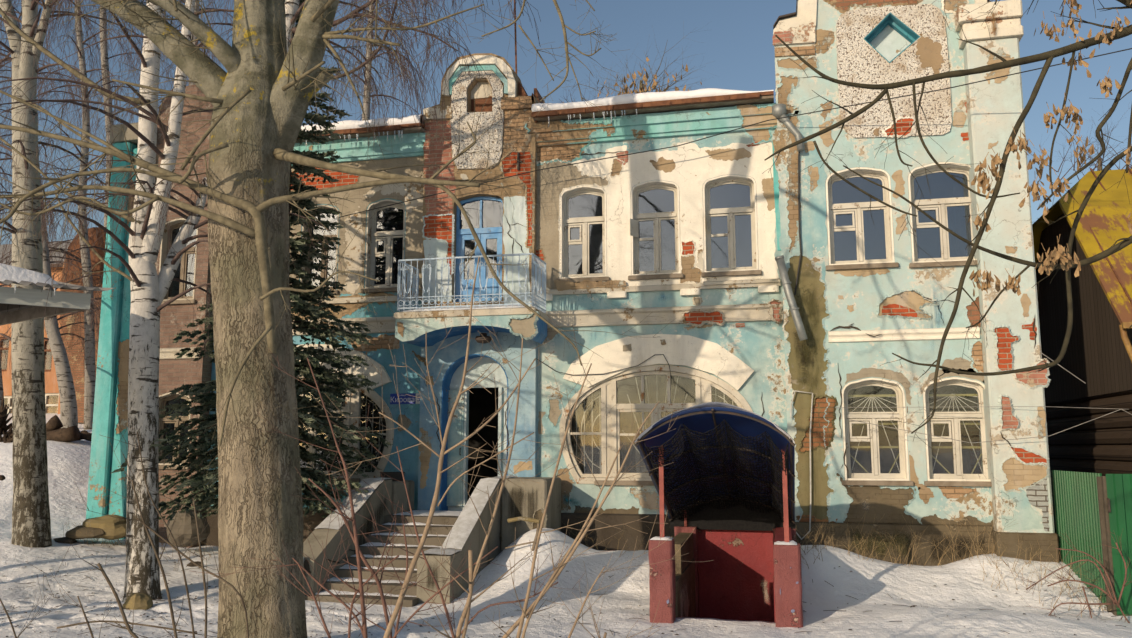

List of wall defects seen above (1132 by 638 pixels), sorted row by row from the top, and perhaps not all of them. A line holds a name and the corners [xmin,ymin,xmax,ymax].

flaking render [823,0,923,13]
peeling [984,49,1014,84]
peeling [289,120,468,320]
peeling [500,110,628,291]
peeling [650,157,676,173]
spalling [507,311,561,345]
flaking render [678,239,745,333]
peeling [705,29,994,530]
flaking render [925,284,1051,390]
flaking render [997,394,1021,431]
peeling [556,466,660,514]
peeling [999,407,1050,531]